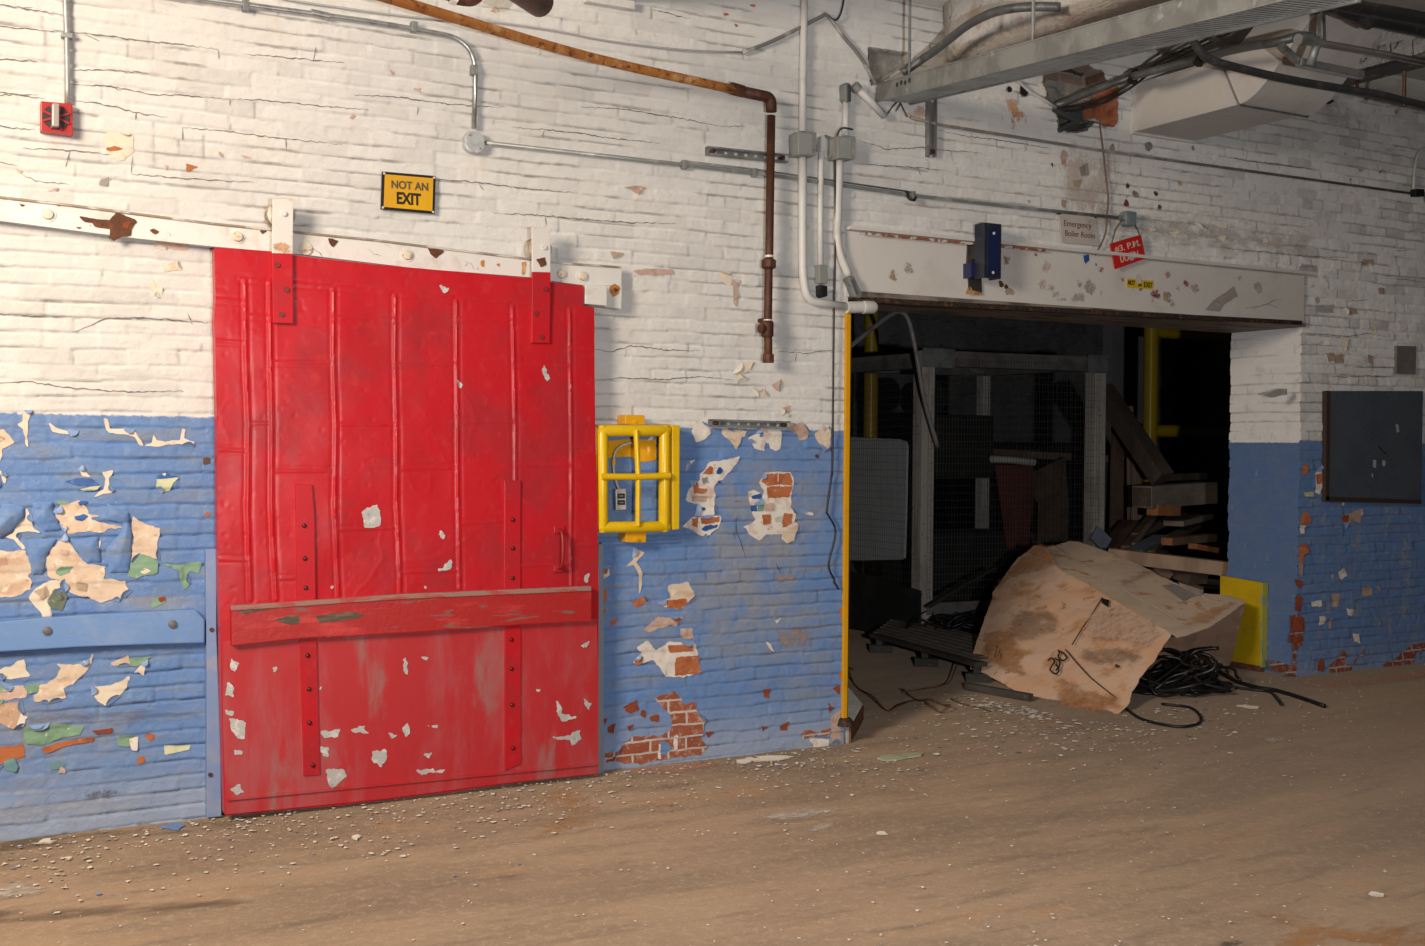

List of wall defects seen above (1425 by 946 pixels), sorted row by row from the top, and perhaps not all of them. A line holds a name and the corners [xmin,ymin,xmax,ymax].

spalling [1006,65,1119,133]
spalling [1051,150,1089,208]
peeling [0,410,33,483]
peeling [49,423,79,436]
peeling [104,418,194,447]
peeling [1304,465,1324,497]
peeling [1340,509,1363,529]
flaking render [1369,642,1425,674]
flaking render [0,547,1365,931]